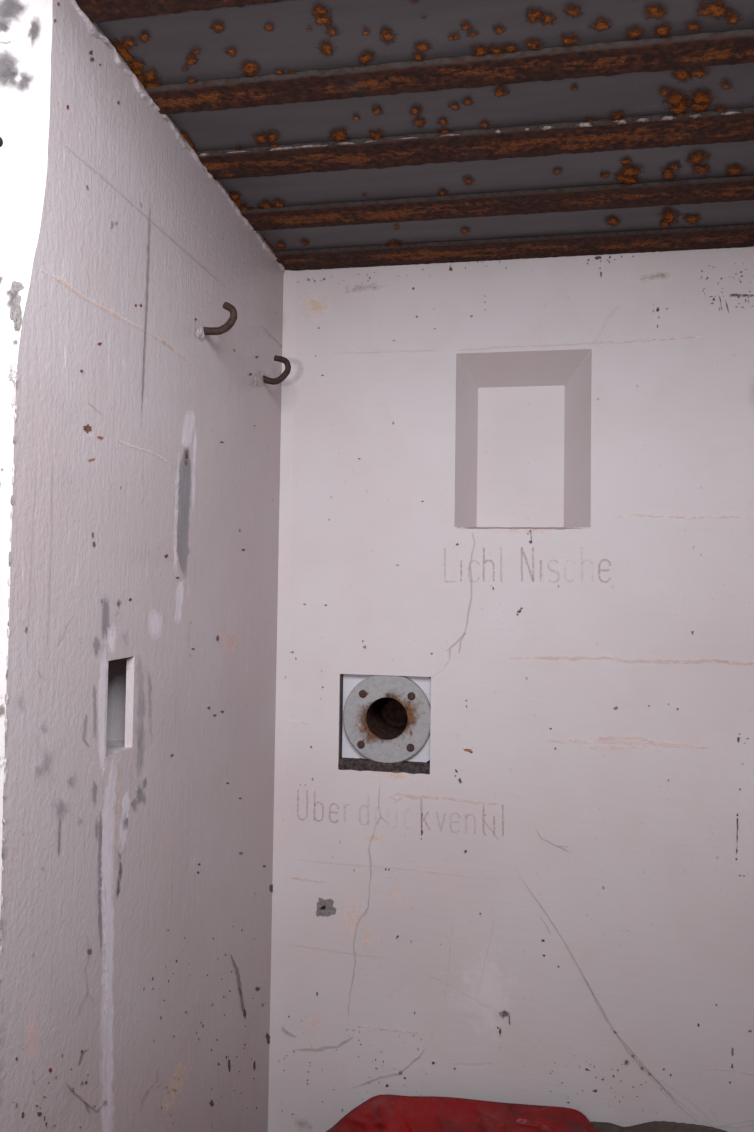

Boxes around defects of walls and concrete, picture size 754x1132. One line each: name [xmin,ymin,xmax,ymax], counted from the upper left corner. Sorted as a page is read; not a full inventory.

rust [113,31,162,88]
rust [307,4,338,56]
rust [349,28,394,69]
rust [448,22,545,57]
rust [525,5,582,26]
rust [625,0,741,41]
rust [658,67,733,115]
rust [410,97,474,134]
rust [600,158,642,185]
rust [659,151,711,181]
rust [229,191,286,210]